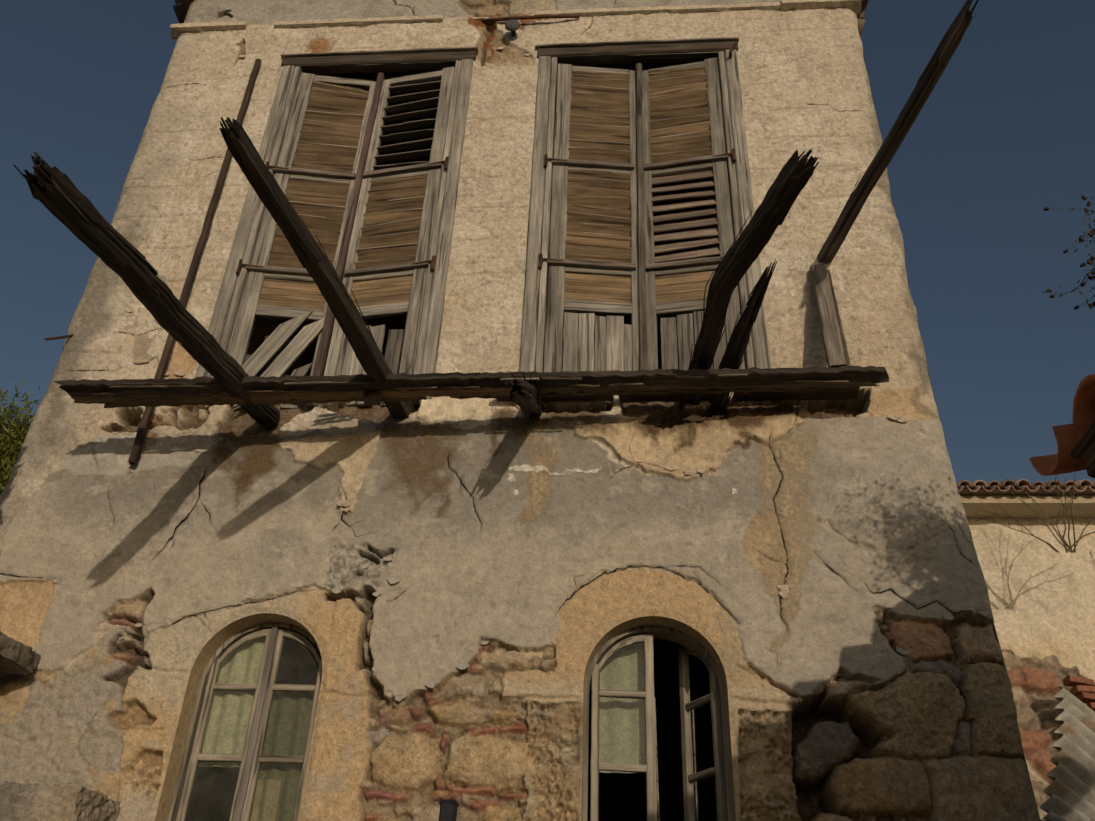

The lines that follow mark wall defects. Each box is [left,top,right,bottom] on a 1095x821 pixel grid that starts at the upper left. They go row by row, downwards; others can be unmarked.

corrosion [468,14,549,60]
spalling [101,405,210,433]
crack [153,467,212,559]
crack [448,455,482,527]
crack [757,400,799,632]
flaking render [0,578,55,652]
spalling [103,588,155,688]
crack [163,590,308,630]
crack [820,558,989,616]
spalling [111,700,156,729]
spalling [325,541,557,821]
spalling [752,610,1040,821]